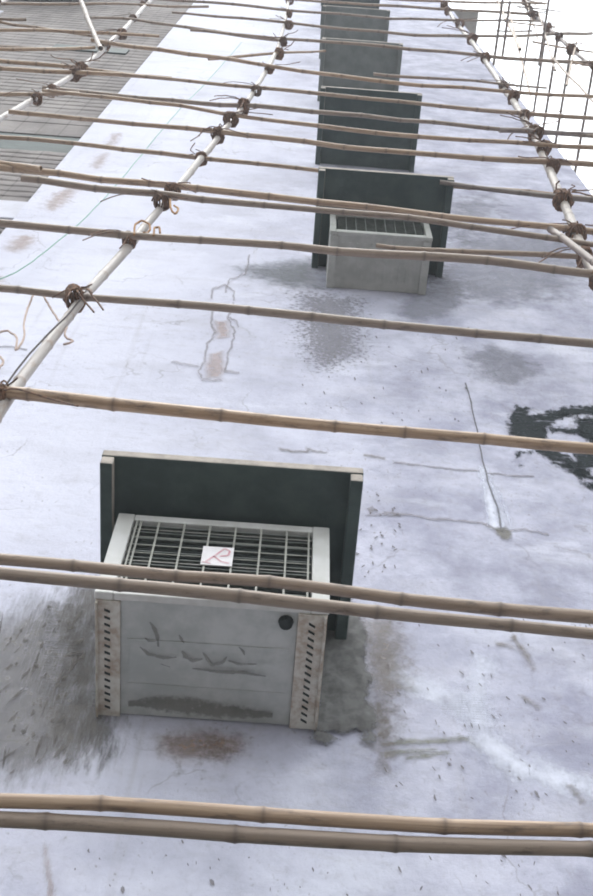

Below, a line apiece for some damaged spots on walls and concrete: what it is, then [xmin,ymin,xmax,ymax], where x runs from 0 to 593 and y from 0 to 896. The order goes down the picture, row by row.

water stain [247,263,372,373]
crack [465,383,502,532]